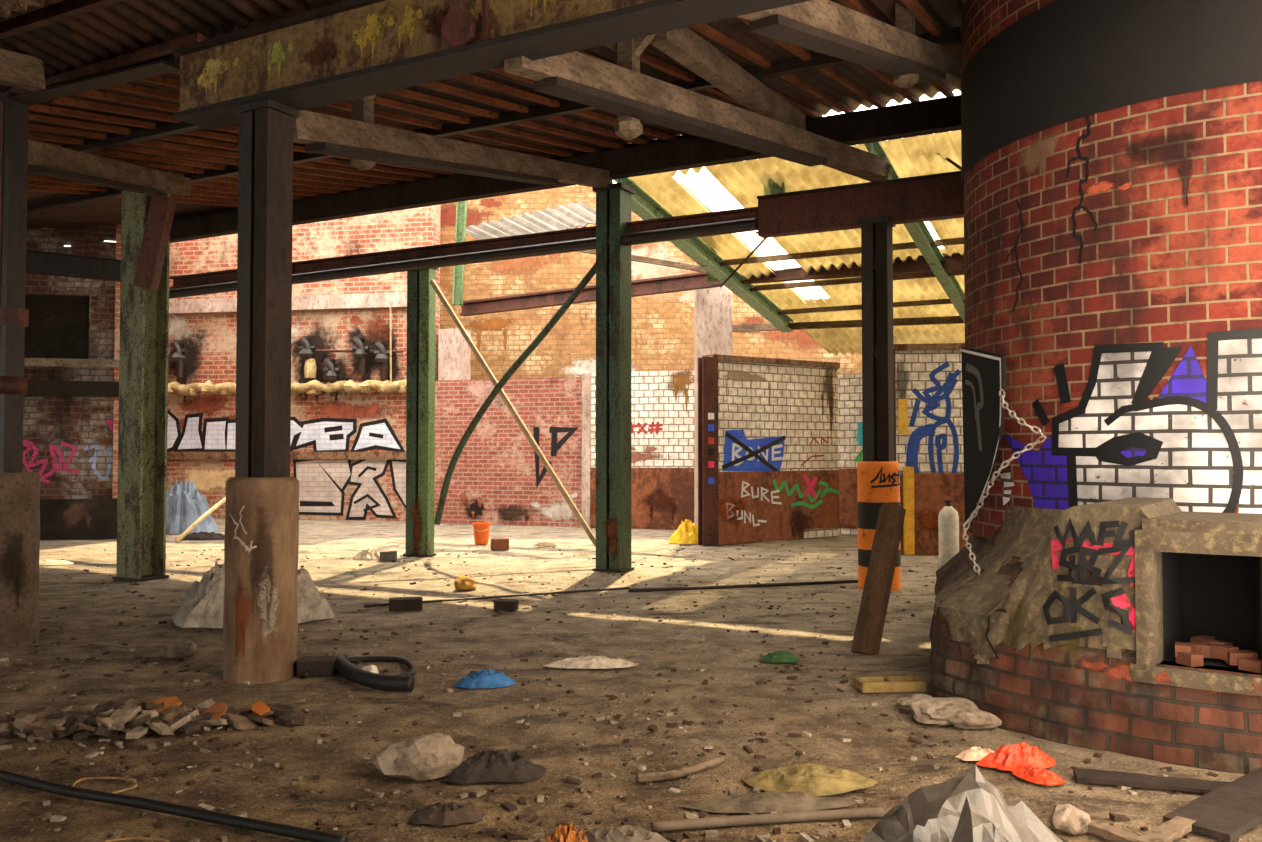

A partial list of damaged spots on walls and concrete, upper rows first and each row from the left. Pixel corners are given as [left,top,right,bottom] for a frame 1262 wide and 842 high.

corrosion [424,8,448,38]
corrosion [300,41,338,70]
crack [1066,116,1098,264]
corrosion [590,467,694,559]
spalling [1082,660,1132,681]